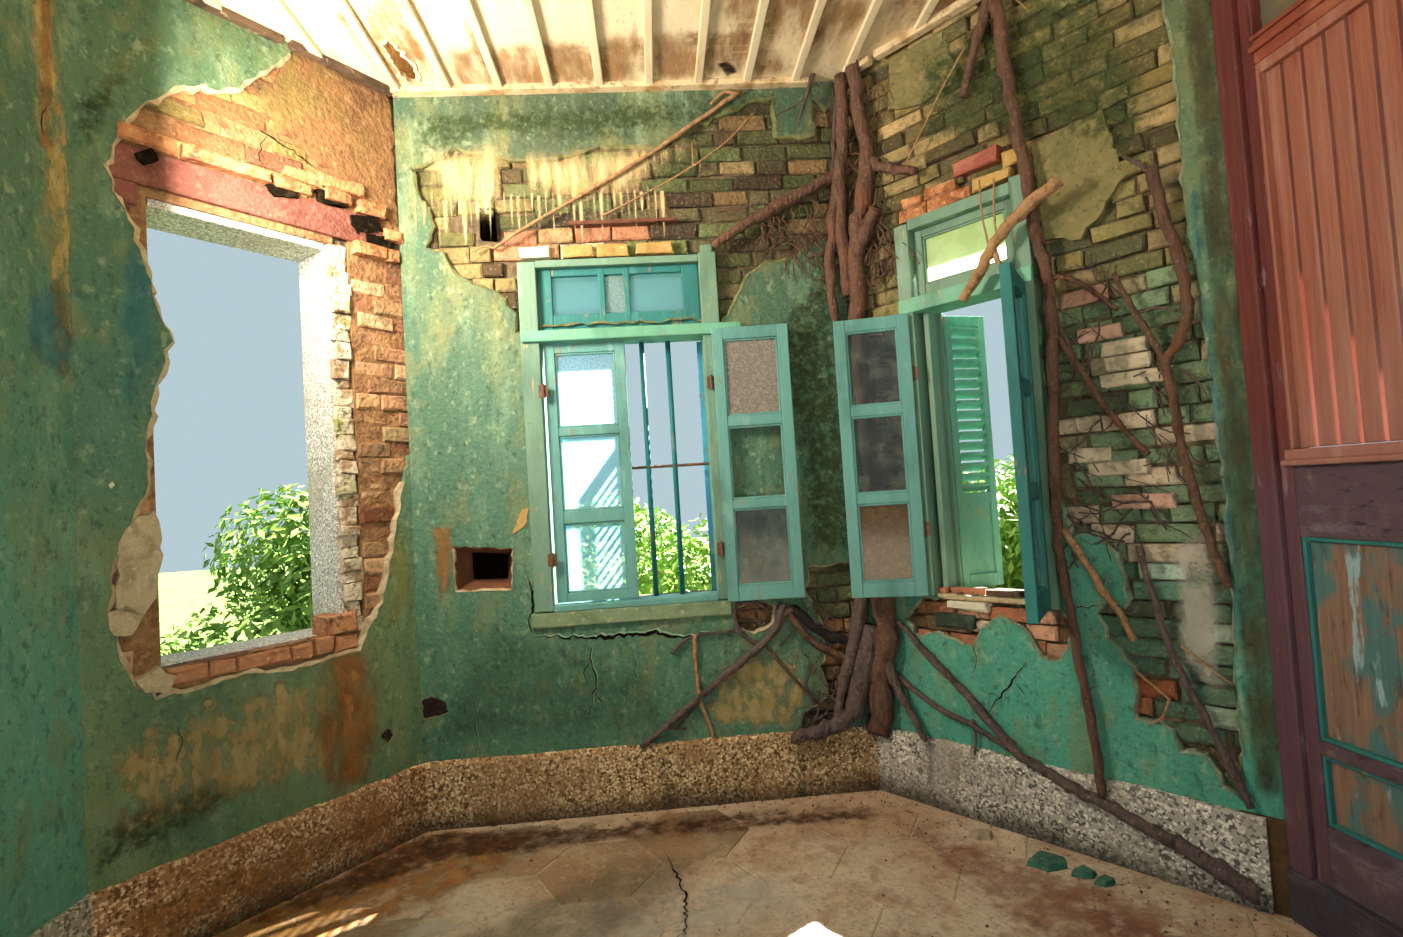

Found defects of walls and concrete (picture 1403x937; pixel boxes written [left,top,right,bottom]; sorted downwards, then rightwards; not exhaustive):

damp [369,2,422,81]
damp [458,0,865,83]
flaking render [103,0,1247,802]
crack [527,577,711,723]